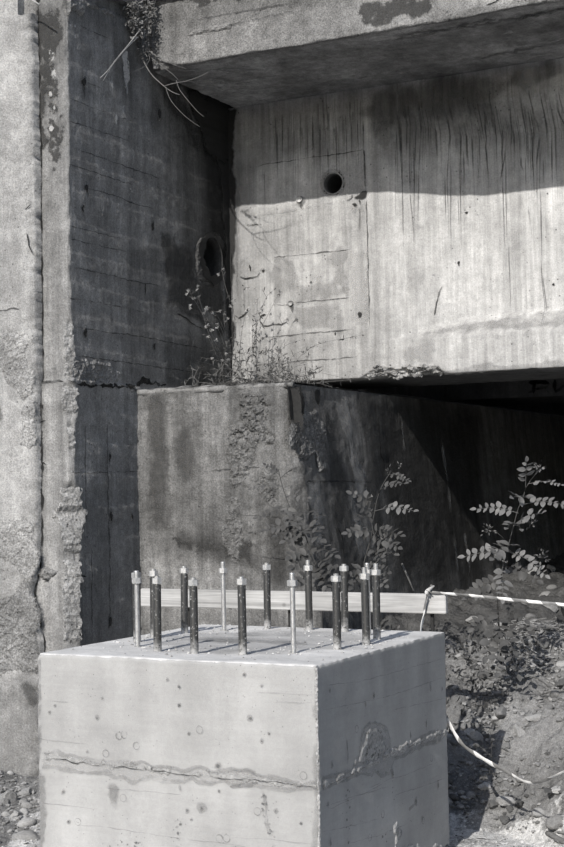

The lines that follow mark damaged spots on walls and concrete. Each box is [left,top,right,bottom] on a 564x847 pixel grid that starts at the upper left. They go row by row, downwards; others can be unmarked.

leakage [36,8,64,170]
leakage [122,51,130,92]
spalling [43,322,166,414]
spalling [66,426,76,450]
spalling [37,486,88,644]